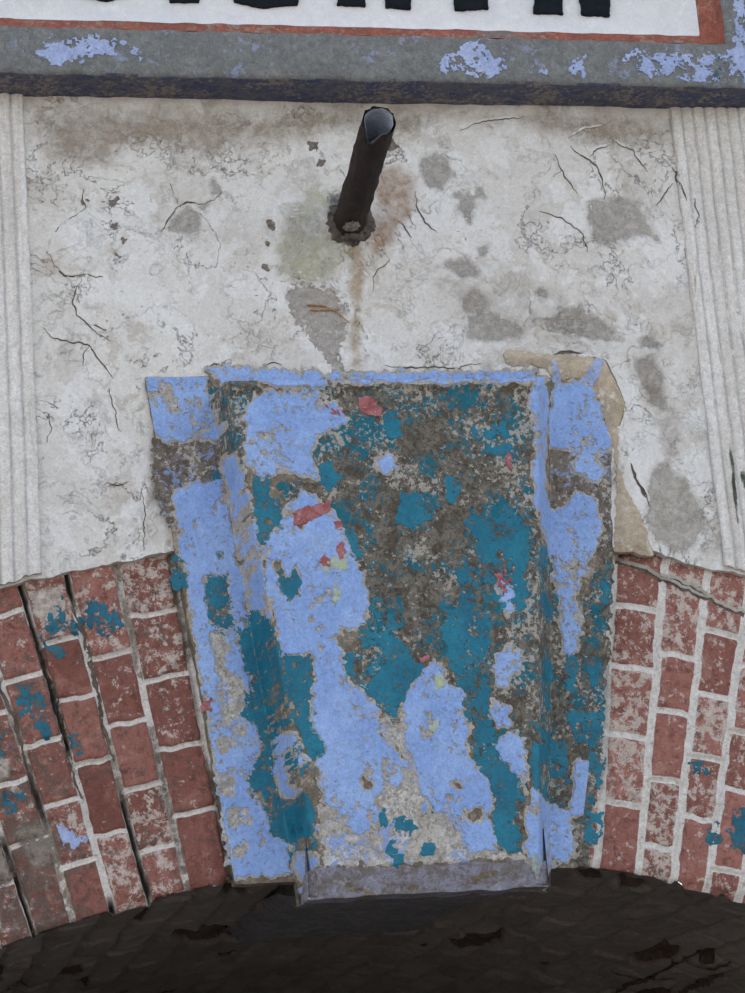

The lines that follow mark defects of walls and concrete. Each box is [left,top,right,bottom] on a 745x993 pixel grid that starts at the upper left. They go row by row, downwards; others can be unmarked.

spalling [307,141,326,167]
crack [553,121,702,228]
crack [158,183,222,232]
crack [539,208,591,252]
crack [43,279,124,431]
peeling [149,276,615,879]
crack [615,557,745,617]
peeling [33,587,124,660]
peeling [16,682,55,741]
peeling [56,823,88,850]
peeling [705,807,745,855]
crack [610,951,731,993]